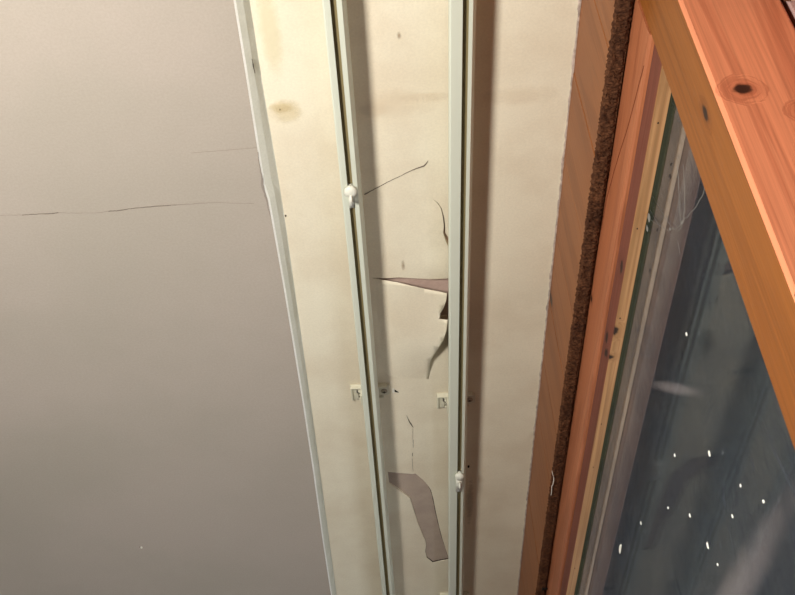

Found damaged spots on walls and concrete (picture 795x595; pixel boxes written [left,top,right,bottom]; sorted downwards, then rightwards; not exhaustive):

crack [98,202,254,213]
peeling [372,277,448,379]
peeling [388,472,448,562]